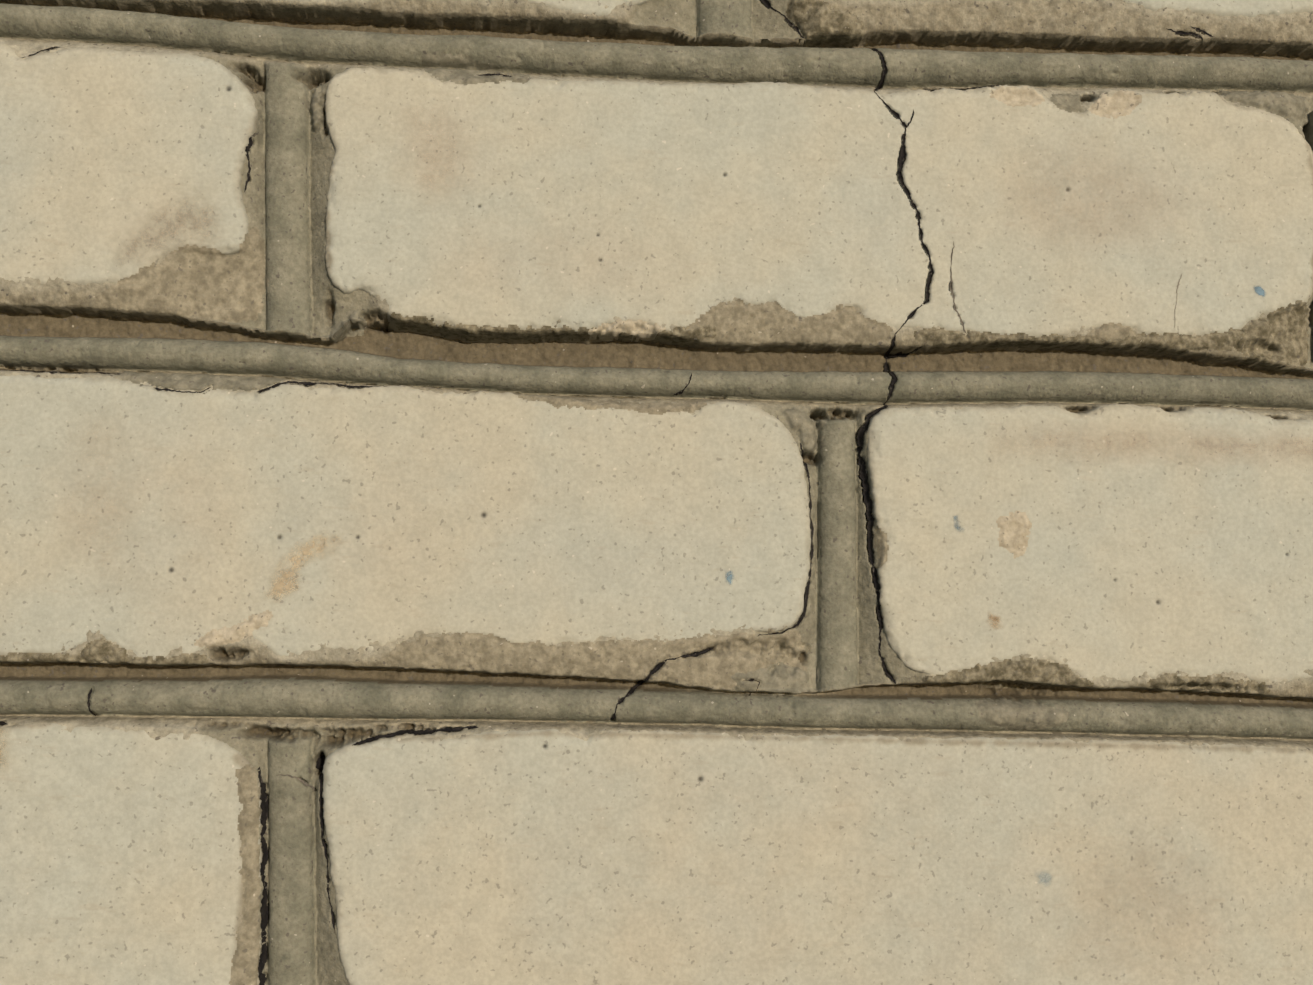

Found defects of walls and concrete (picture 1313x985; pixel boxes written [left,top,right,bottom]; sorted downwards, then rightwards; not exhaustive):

crack [762,0,805,43]
crack [857,48,999,684]
spalling [914,327,1244,355]
crack [758,443,814,636]
crack [612,648,713,719]
crack [258,726,478,985]